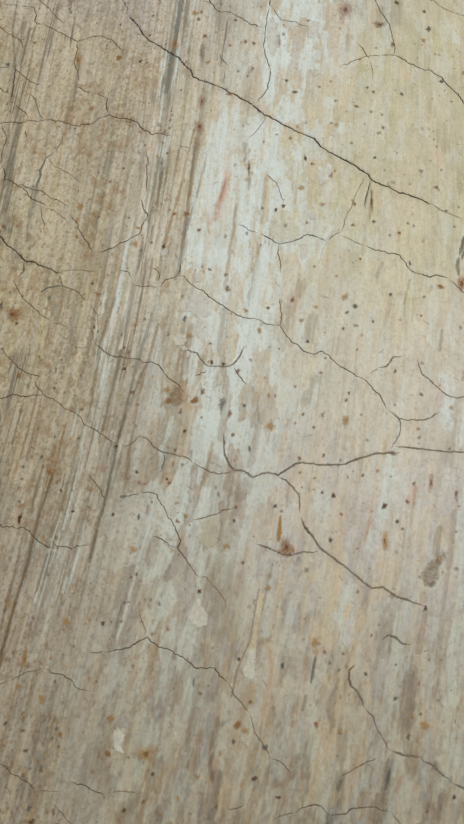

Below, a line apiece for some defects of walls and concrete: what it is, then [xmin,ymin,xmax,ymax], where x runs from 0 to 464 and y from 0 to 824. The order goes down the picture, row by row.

crack [0,0,185,393]
crack [123,0,464,292]
crack [0,265,464,605]
crack [1,668,88,691]
crack [0,764,135,824]
crack [91,612,290,772]
crack [273,804,401,824]
crack [339,666,464,789]